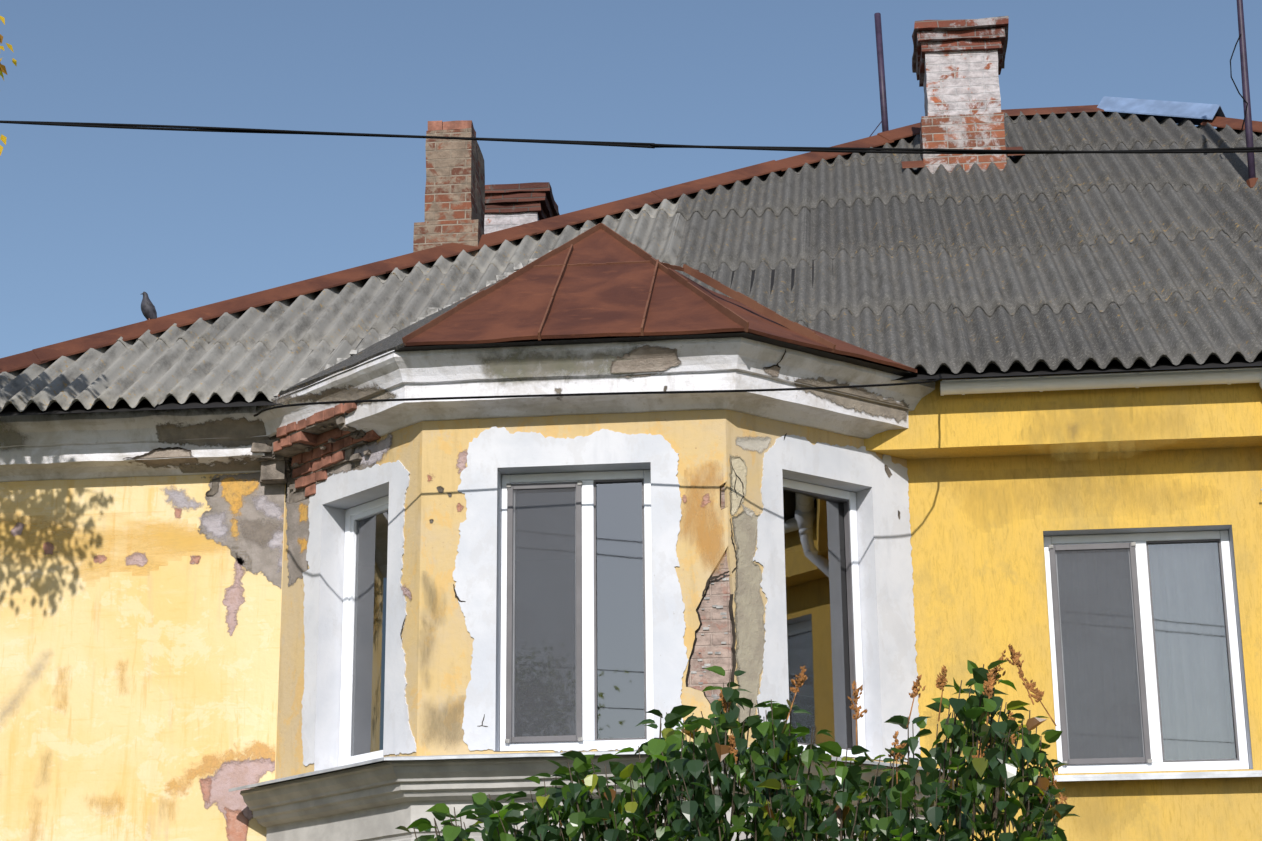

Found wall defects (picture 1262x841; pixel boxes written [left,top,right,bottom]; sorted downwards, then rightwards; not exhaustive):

flaking render [610,345,681,391]
peeling [763,349,909,423]
flaking render [123,383,396,636]
flaking render [685,455,754,704]
peeling [200,757,275,841]